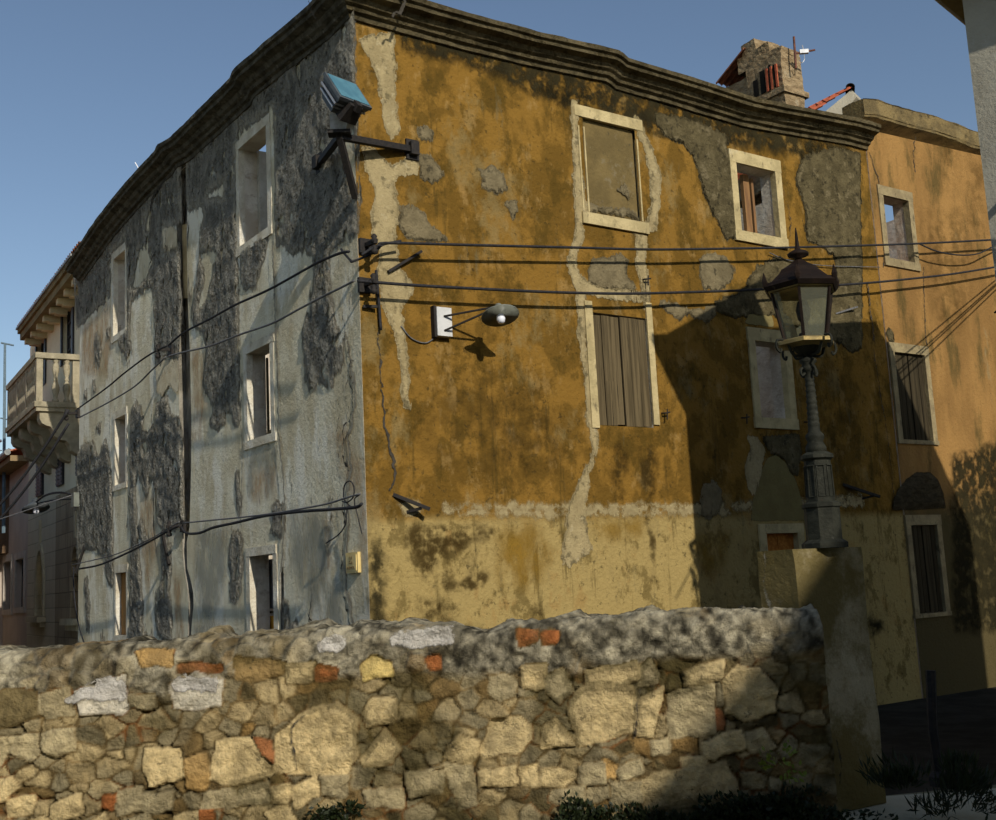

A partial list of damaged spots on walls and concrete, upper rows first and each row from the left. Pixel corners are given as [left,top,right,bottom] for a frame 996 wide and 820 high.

peeling [73,10,362,432]
flaking render [398,203,448,243]
flaking render [588,252,636,290]
flaking render [654,112,735,242]
flaking render [659,146,864,354]
peeling [84,576,105,642]
peeling [76,422,114,587]
peeling [128,395,186,641]
peeling [228,470,244,605]
crack [336,316,356,624]
crack [376,294,397,491]
water stain [443,573,487,590]